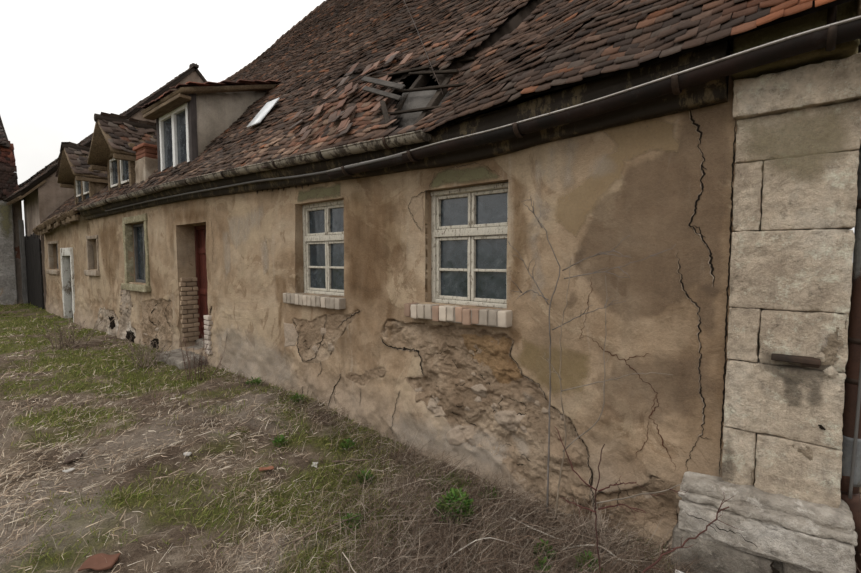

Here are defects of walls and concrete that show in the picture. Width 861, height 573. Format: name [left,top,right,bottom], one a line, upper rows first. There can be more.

leakage [556,119,679,234]
flaking render [94,286,174,352]
flaking render [294,311,361,363]
crack [579,110,736,474]
flaking render [380,321,677,549]